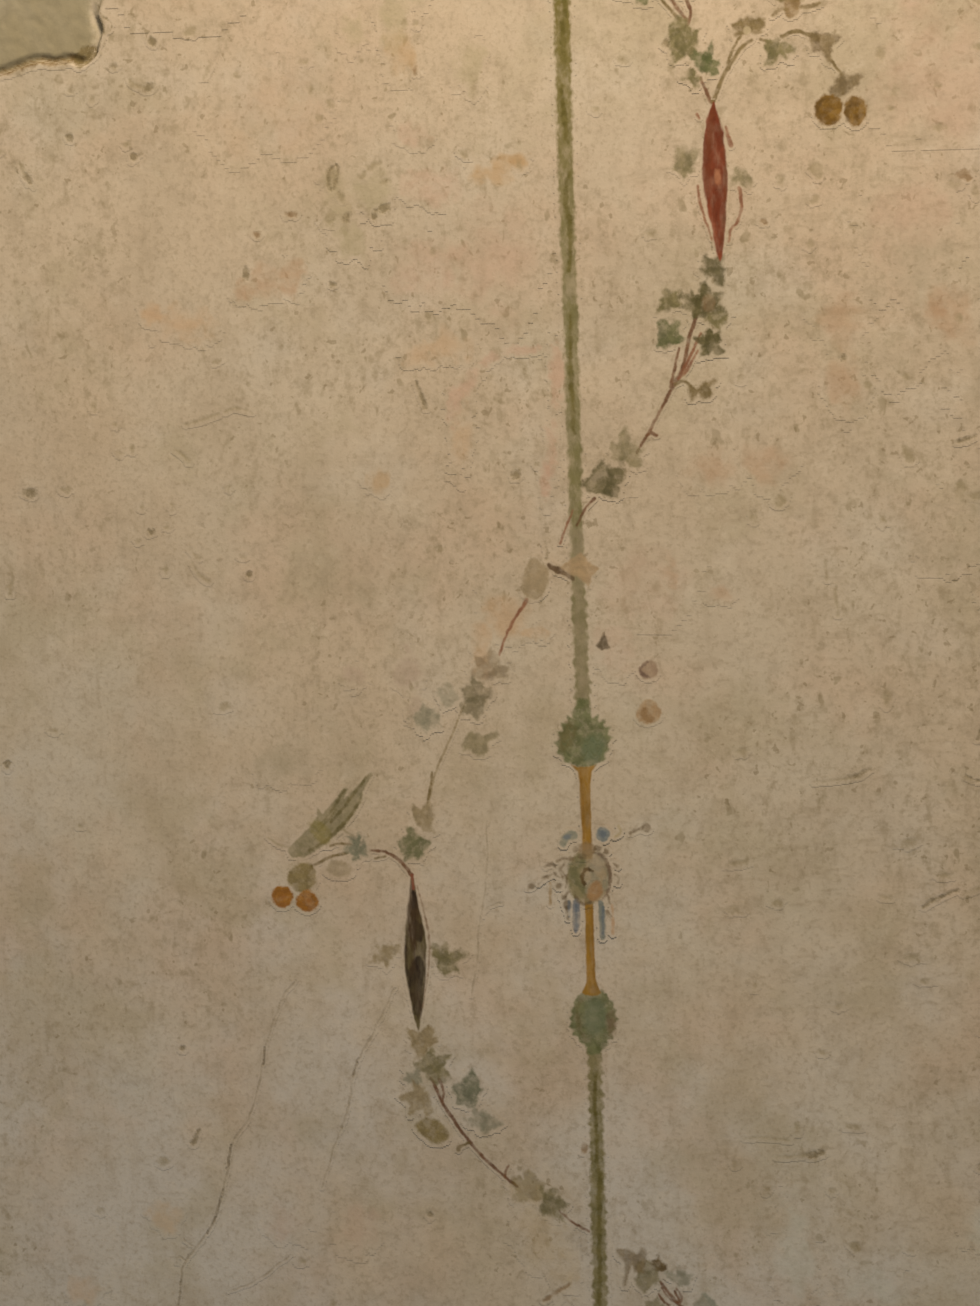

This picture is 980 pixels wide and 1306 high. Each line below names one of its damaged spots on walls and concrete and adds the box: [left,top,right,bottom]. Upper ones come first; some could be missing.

crack [174,977,299,1306]